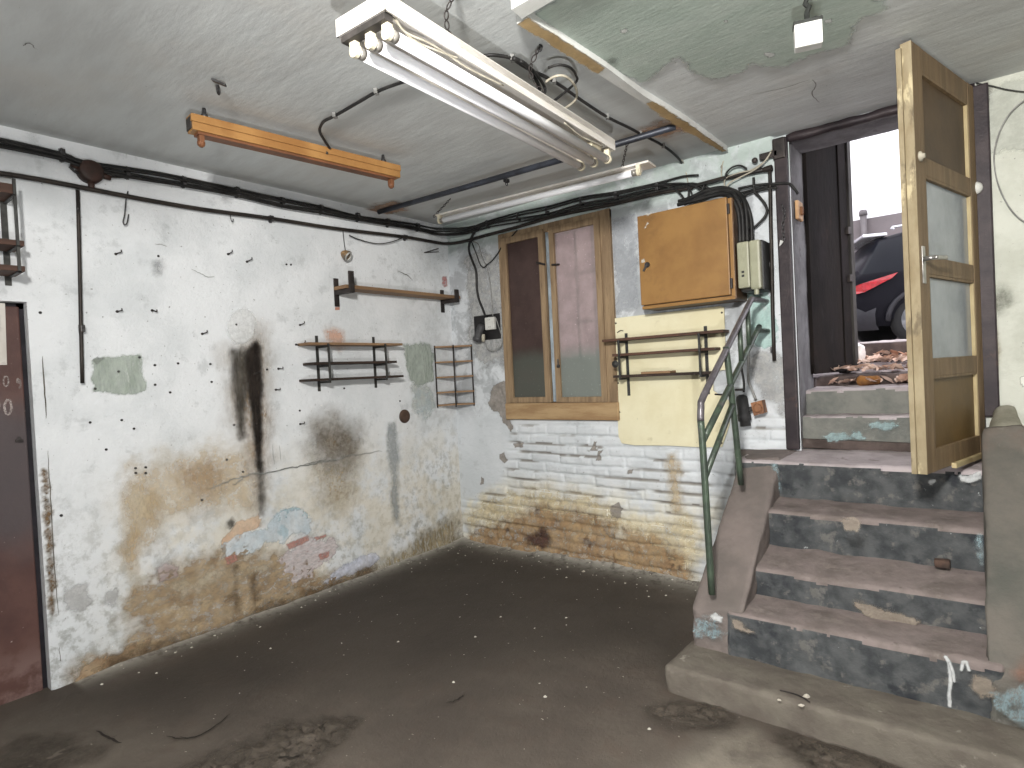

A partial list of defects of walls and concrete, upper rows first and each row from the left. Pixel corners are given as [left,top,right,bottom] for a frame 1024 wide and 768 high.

peeling [518,0,885,82]
water stain [316,423,356,456]
water stain [126,451,264,569]
spalling [841,517,861,532]
peeling [221,507,379,584]
water stain [70,491,694,675]
peeling [693,613,753,639]
spalling [854,602,920,625]
peeling [970,675,1024,722]
crack [97,731,122,743]
crack [168,715,228,739]